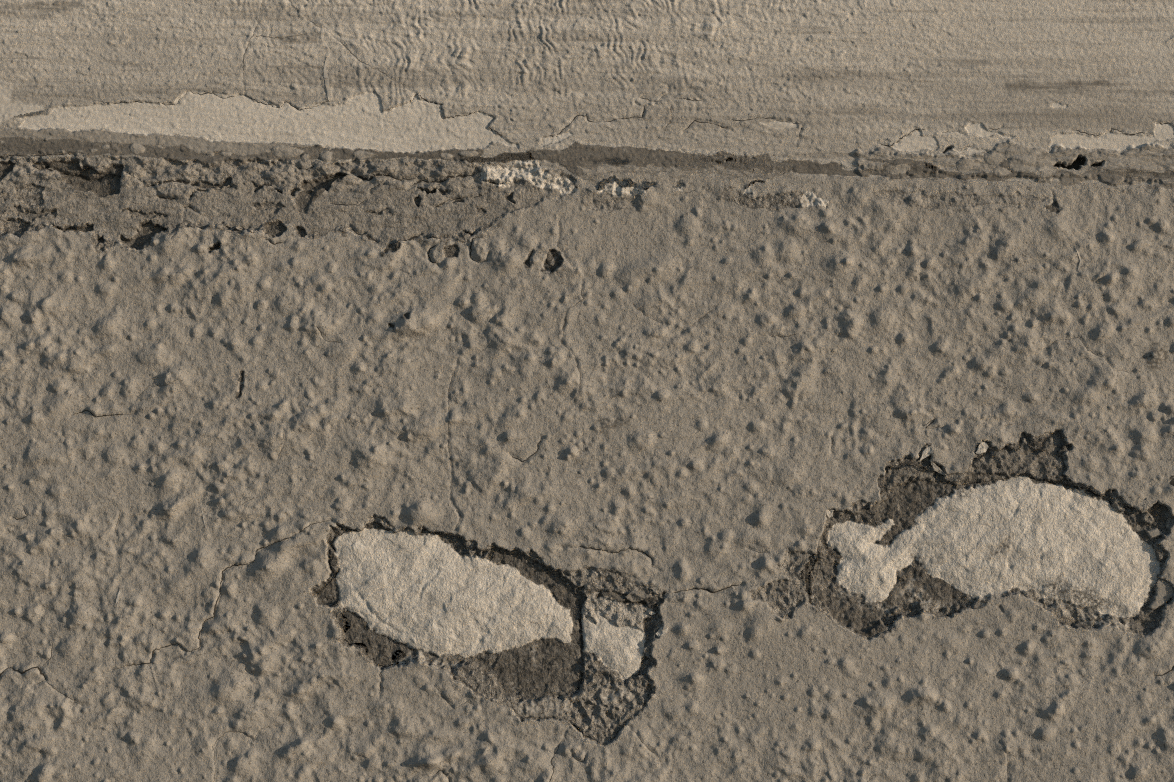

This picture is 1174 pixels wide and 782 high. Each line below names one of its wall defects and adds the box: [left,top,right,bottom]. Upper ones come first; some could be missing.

peeling [759,120,798,130]
peeling [855,122,1174,213]
crack [0,643,81,705]
crack [112,520,332,670]
spalling [310,512,679,745]
spalling [751,429,1174,639]